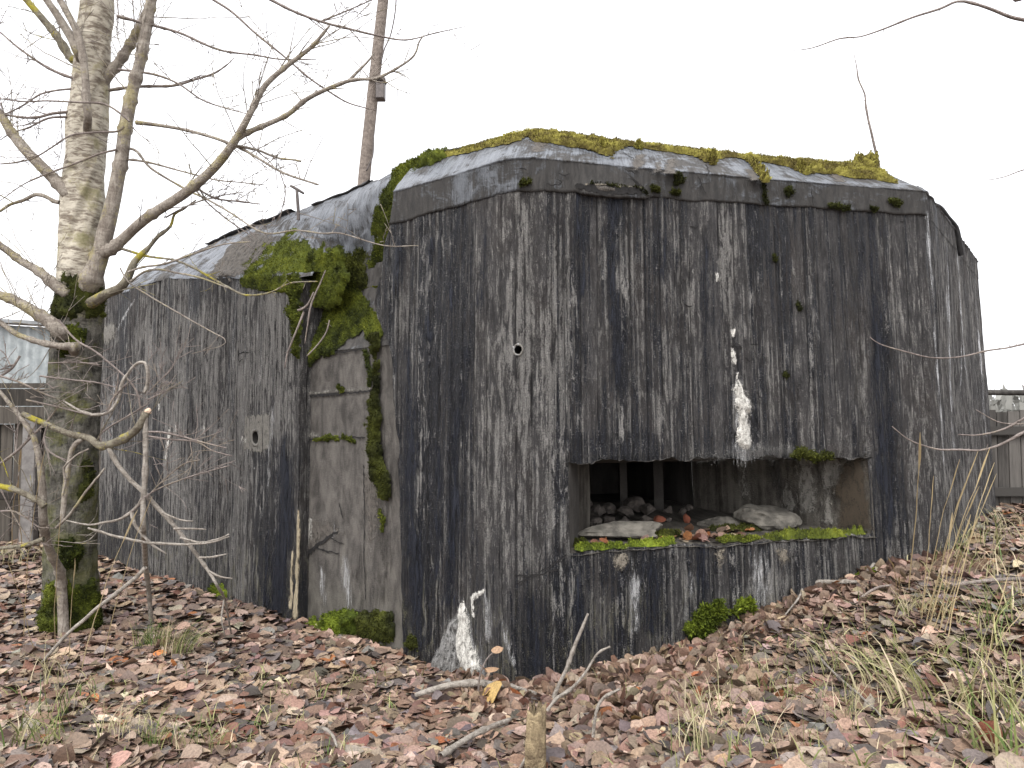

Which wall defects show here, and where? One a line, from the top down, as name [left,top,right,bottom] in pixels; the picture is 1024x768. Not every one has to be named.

damp [731,349,752,498]
damp [782,458,843,524]